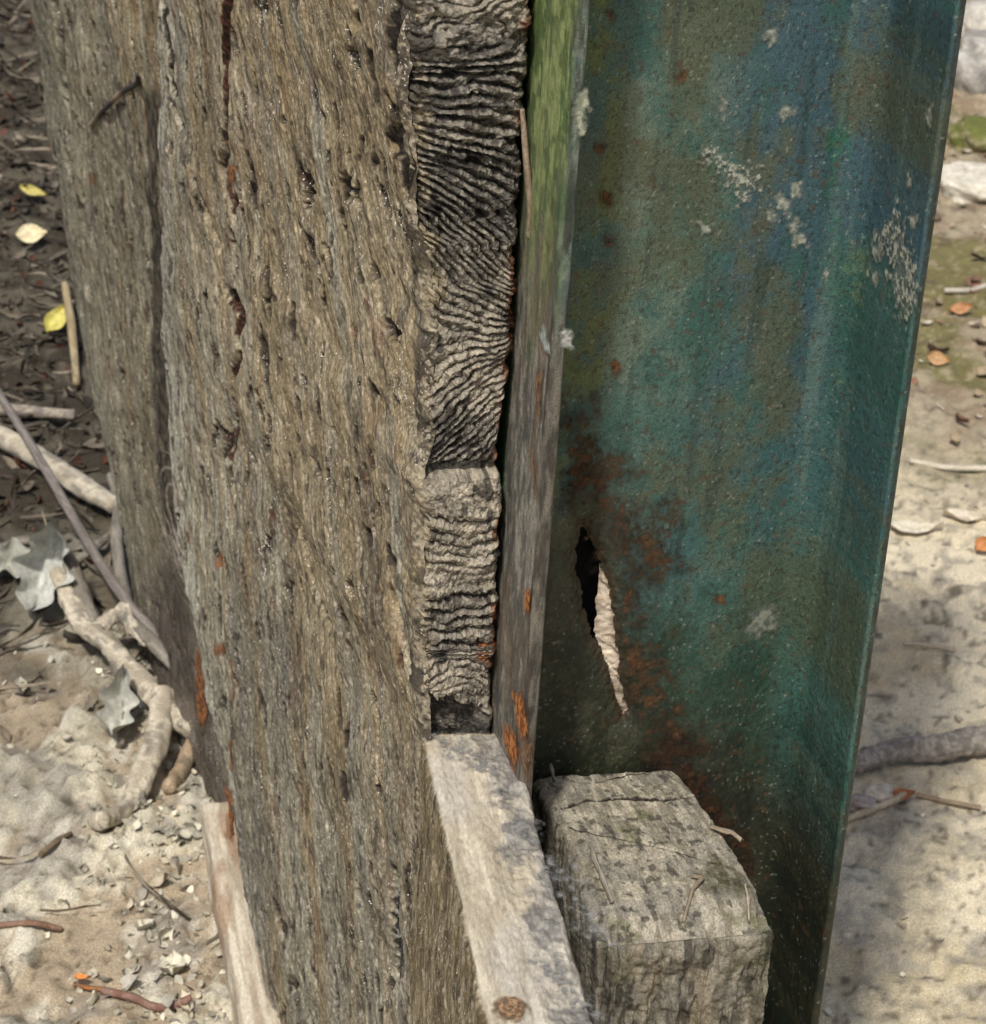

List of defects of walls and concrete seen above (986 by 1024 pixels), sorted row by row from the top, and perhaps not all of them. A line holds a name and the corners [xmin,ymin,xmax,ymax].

rust [195,649,208,726]
rust [503,690,533,781]
rust [558,406,755,876]
crack [561,763,716,864]